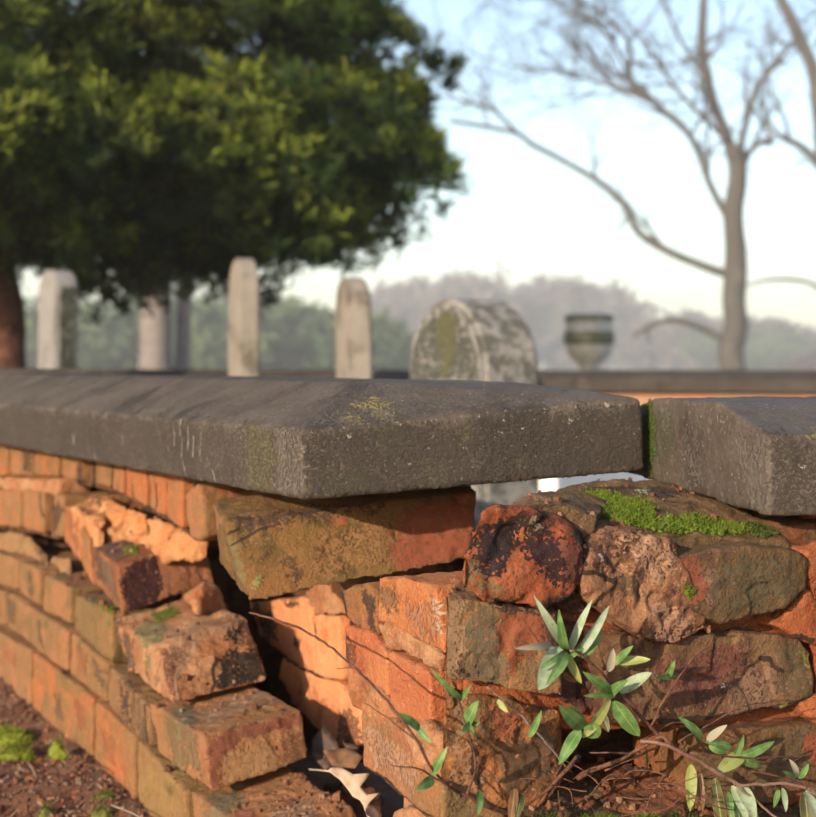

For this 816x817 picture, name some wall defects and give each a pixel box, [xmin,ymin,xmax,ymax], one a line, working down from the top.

spalling [486,527,541,600]
spalling [155,615,241,702]
crack [286,658,336,681]
spalling [492,607,554,681]